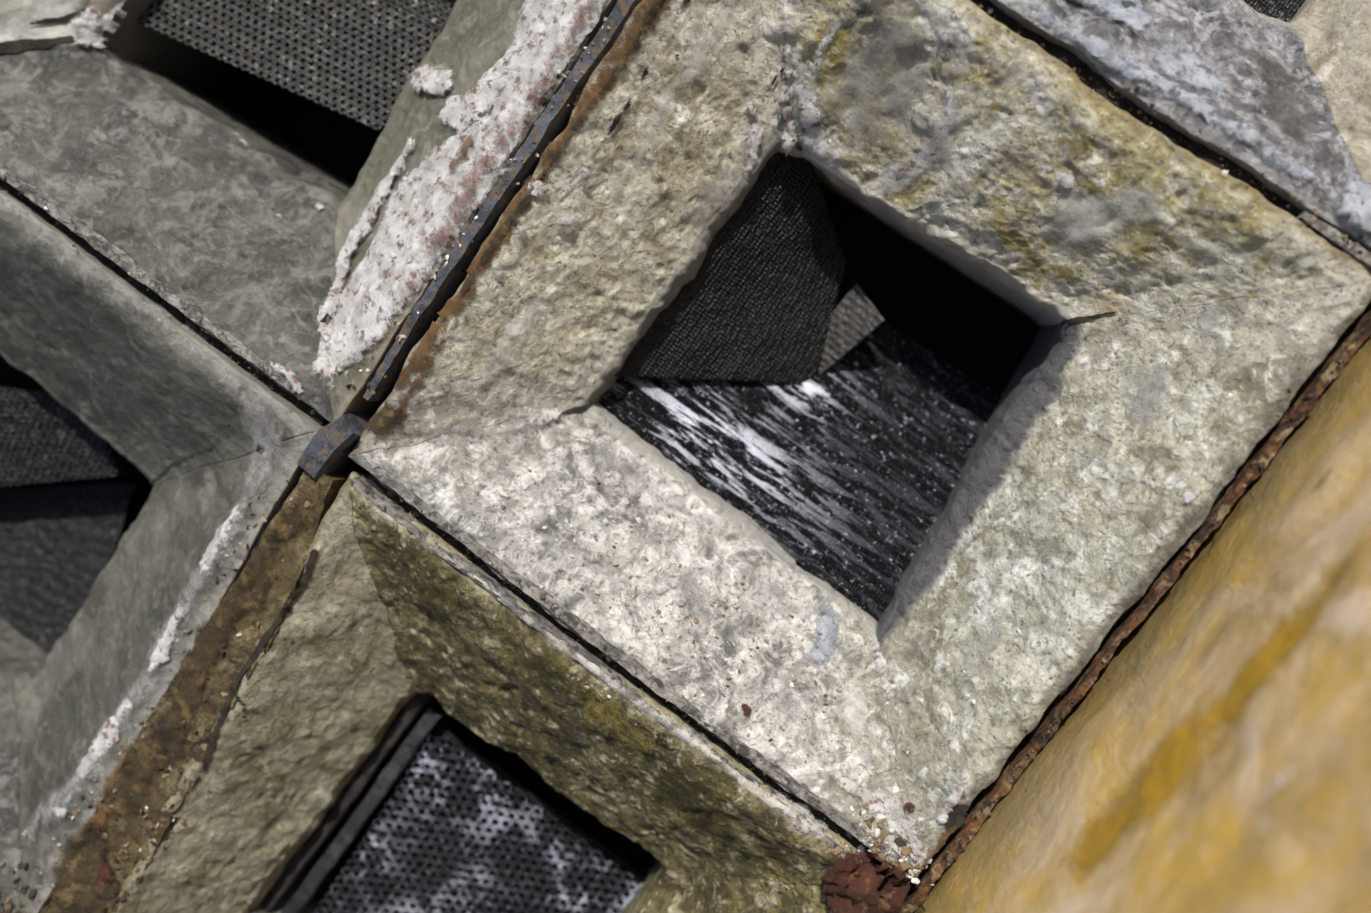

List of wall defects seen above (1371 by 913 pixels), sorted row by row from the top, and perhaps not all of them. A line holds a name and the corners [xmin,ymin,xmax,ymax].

corrosion [364,0,670,435]
corrosion [52,510,305,913]
corrosion [820,300,1371,913]